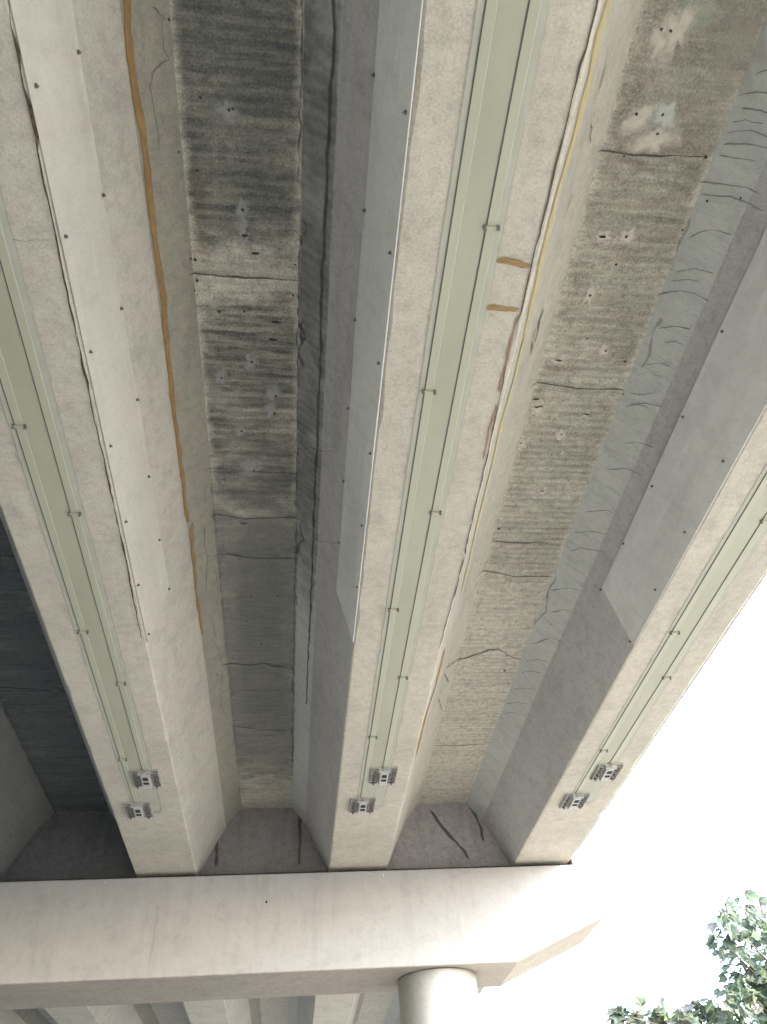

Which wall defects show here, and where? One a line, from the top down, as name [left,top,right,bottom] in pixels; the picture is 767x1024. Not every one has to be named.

crack [8,0,141,635]
rust [124,0,203,634]
crack [204,529,293,714]
damp [176,0,336,775]
crack [439,367,557,715]
rust [461,0,612,592]
crack [514,0,598,340]
crack [629,326,690,407]
crack [657,268,712,302]
crack [700,181,763,211]
crack [719,70,767,161]